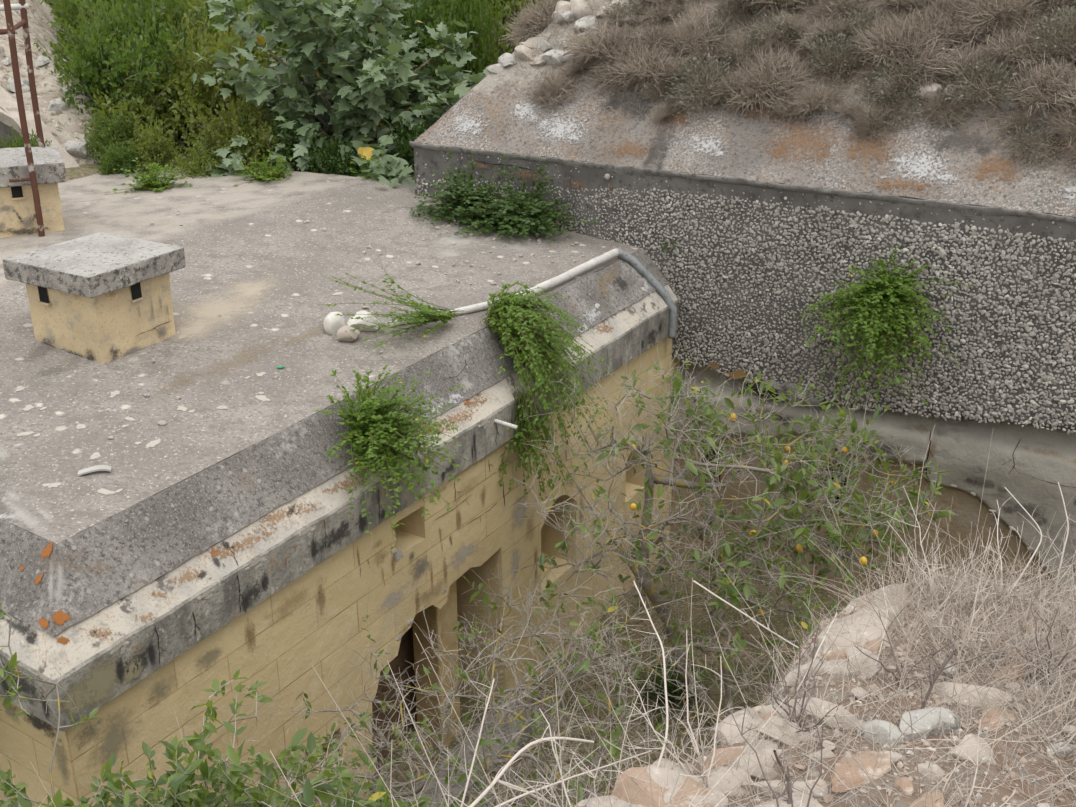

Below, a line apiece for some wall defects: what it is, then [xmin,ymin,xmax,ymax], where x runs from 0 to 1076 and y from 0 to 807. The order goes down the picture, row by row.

leakage [311,516,366,555]
leakage [242,573,268,611]